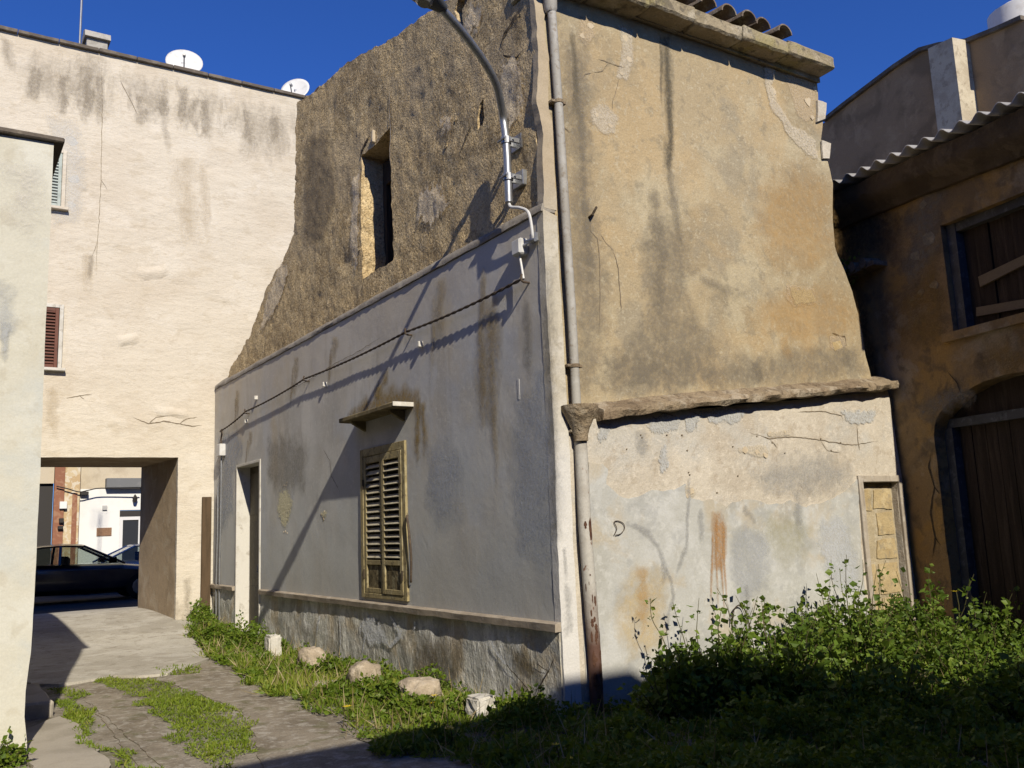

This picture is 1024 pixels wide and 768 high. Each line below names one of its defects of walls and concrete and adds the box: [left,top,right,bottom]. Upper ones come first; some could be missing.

peeling [764,66,817,158]
crack [93,77,138,263]
crack [138,416,199,427]
crack [750,411,876,452]
corrosion [711,514,726,591]
corrosion [585,574,603,700]